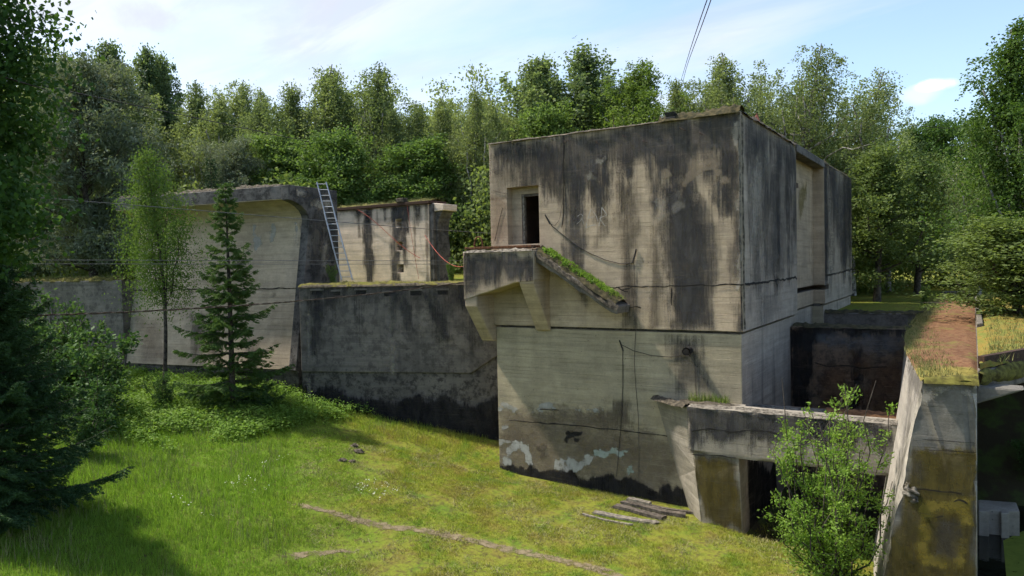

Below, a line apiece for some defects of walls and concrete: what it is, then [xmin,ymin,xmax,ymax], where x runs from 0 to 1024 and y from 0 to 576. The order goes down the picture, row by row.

leakage [357,209,375,282]
leakage [390,204,427,333]
leakage [458,252,533,307]
leakage [497,112,797,392]
leakage [824,165,852,286]
leakage [499,400,673,493]
leakage [687,327,906,456]